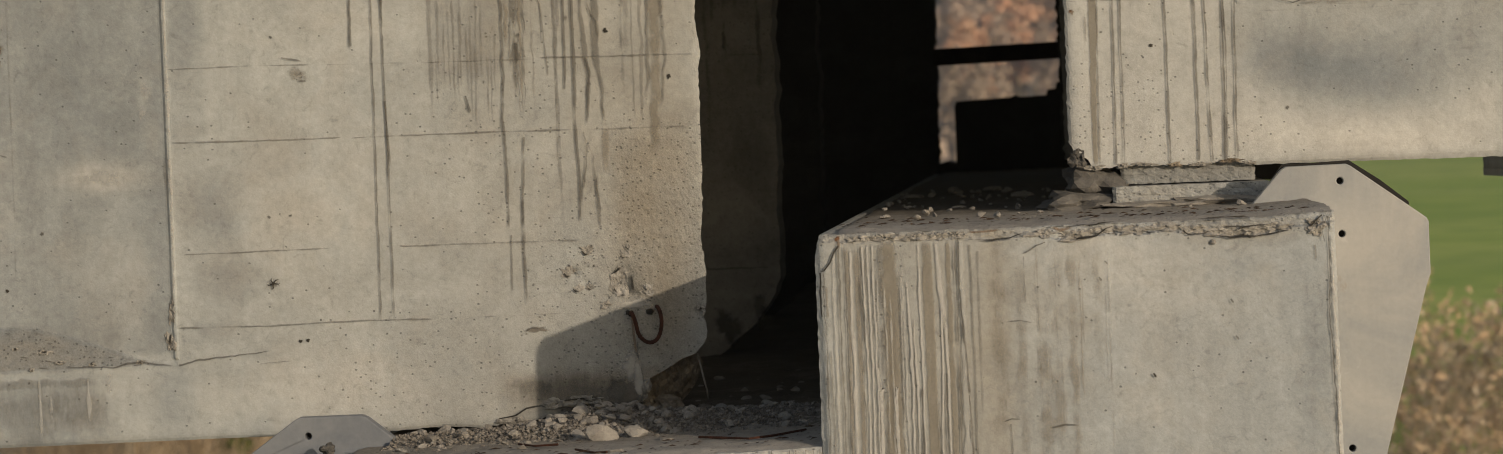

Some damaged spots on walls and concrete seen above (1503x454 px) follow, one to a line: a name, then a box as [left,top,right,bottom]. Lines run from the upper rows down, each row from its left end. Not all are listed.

water stain [645,0,664,140]
water stain [499,0,604,291]
spalling [559,241,654,309]
spalling [845,214,1327,245]
spalling [641,352,703,409]
water stain [823,238,979,454]